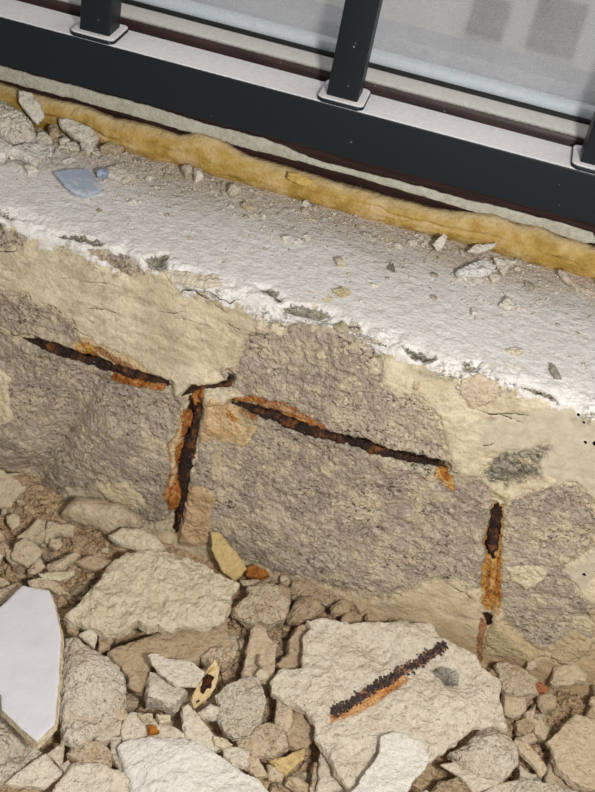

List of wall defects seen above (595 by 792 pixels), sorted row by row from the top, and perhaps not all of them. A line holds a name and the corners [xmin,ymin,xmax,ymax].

spalling [0,212,25,249]
peeling [59,235,221,289]
spalling [0,290,171,385]
corrosion [64,338,169,391]
peeling [0,369,14,425]
peeling [99,481,147,508]
corrosion [163,384,455,532]
spalling [175,289,595,664]
corrosion [477,503,505,663]